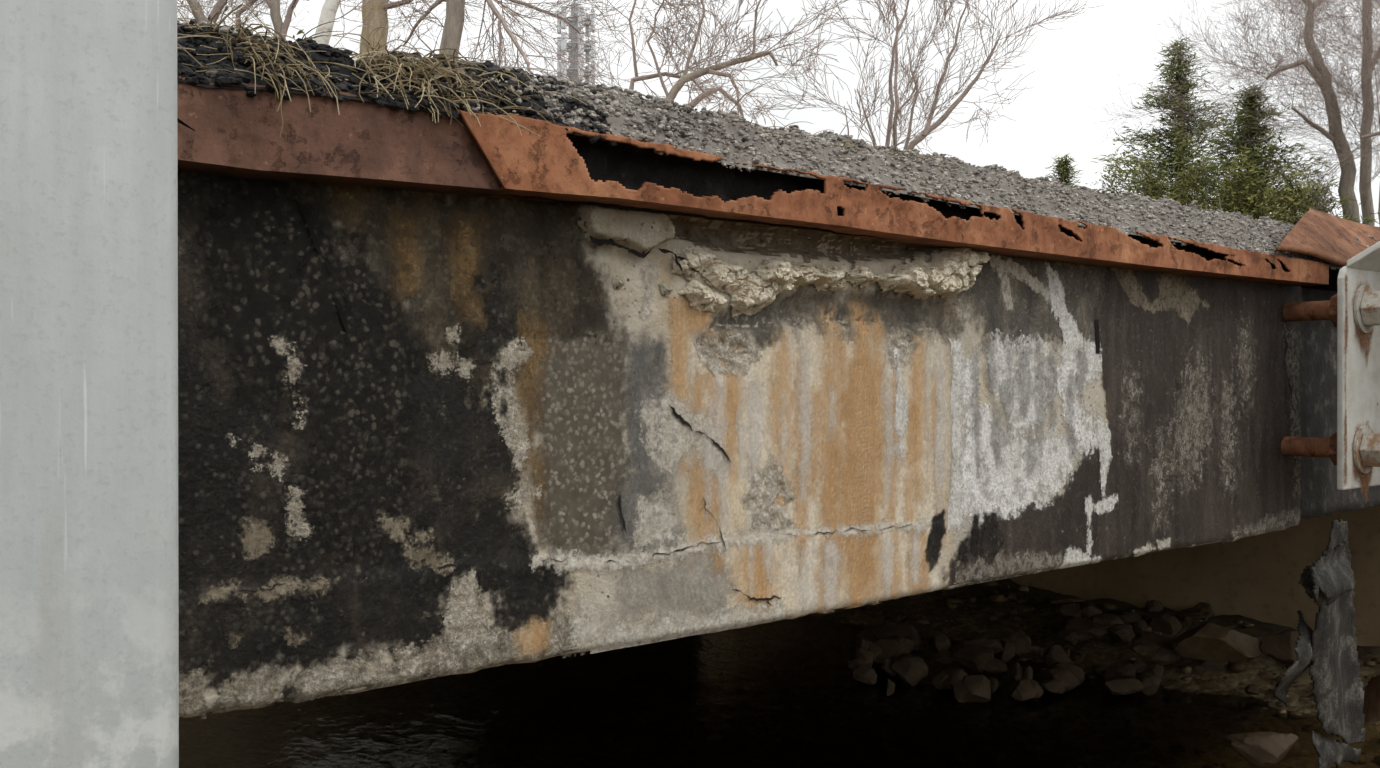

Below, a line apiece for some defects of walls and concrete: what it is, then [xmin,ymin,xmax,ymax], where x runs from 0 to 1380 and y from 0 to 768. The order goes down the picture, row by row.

rust [449,219,482,320]
spalling [668,215,991,378]
rust [512,319,548,518]
crack [669,405,730,461]
damp [178,170,1302,706]
rust [672,298,954,624]
crack [207,495,930,595]
crack [732,589,782,606]